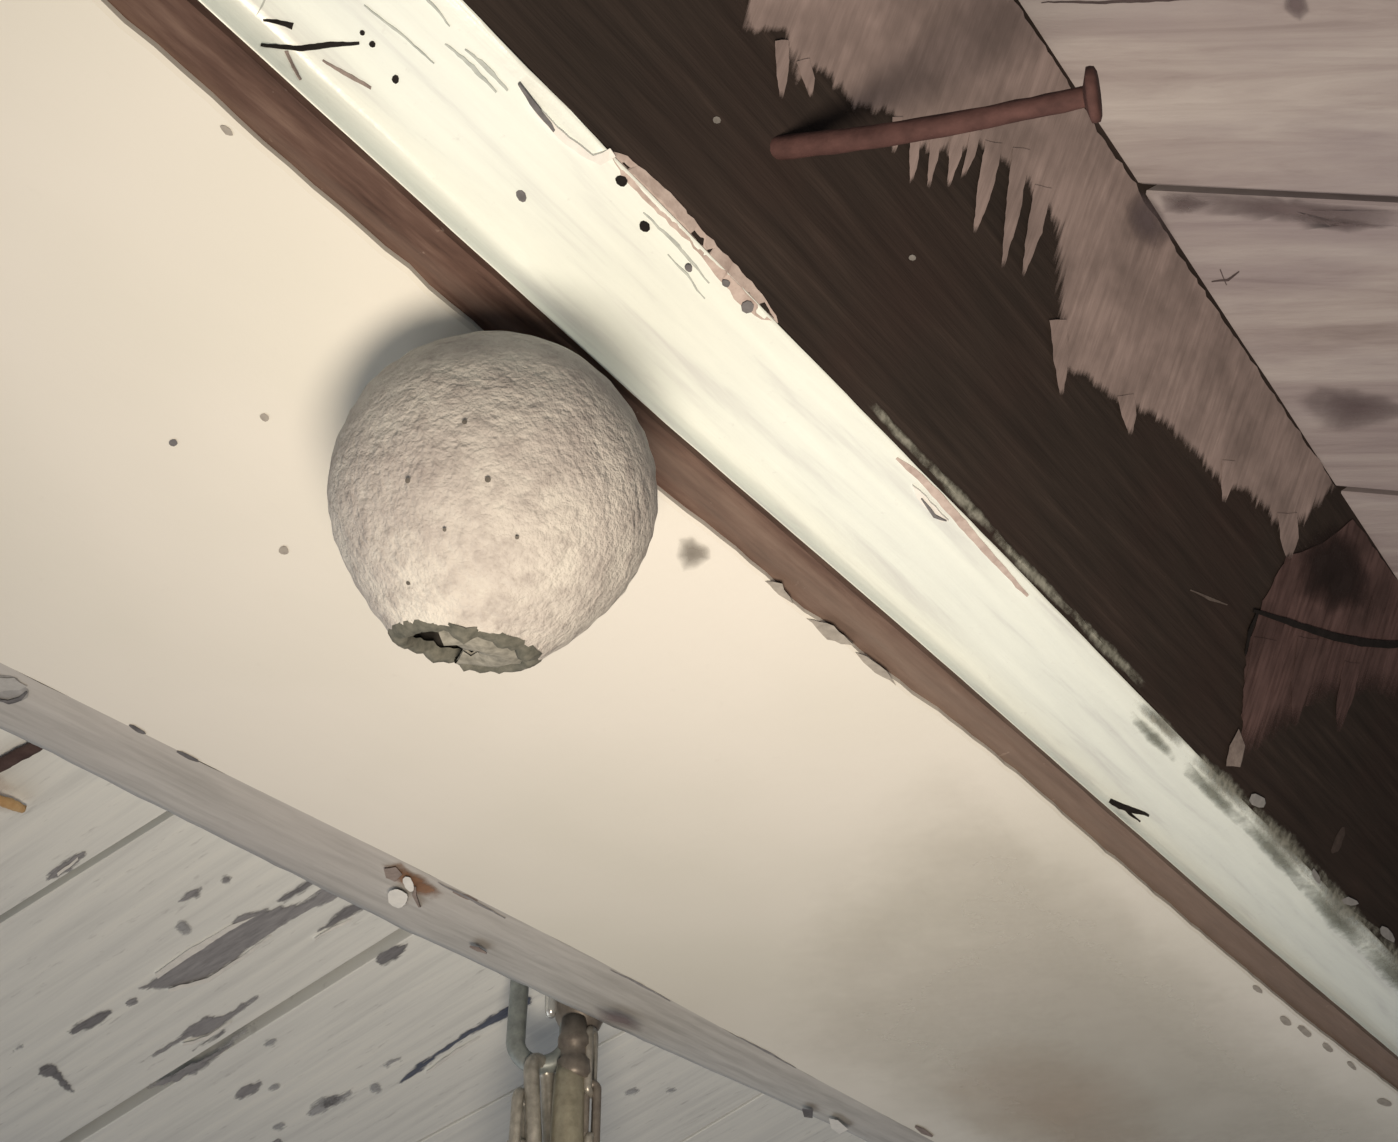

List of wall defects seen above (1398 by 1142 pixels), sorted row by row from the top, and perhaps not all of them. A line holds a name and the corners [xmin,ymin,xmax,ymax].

peeling [426,0,778,323]
peeling [879,412,1062,604]
peeling [1226,729,1245,767]
spalling [384,867,435,908]
peeling [126,881,362,1006]
peeling [376,945,407,965]
peeling [70,1011,111,1034]
peeling [149,996,258,1088]
peeling [386,1007,508,1083]
peeling [38,1065,73,1092]
peeling [236,1082,278,1100]
peeling [308,1092,351,1115]